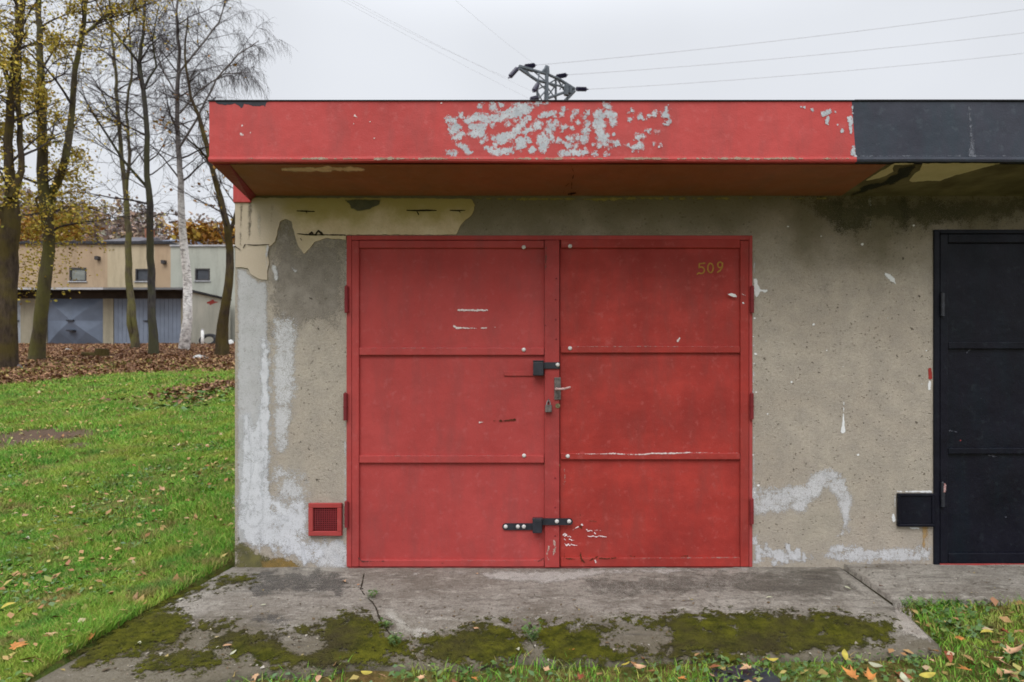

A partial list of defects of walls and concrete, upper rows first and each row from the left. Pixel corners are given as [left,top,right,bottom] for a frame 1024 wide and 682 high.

peeling [374,101,803,160]
peeling [800,106,853,133]
damp [800,106,1024,245]
damp [234,314,358,597]
damp [482,467,932,600]
crack [341,573,406,638]